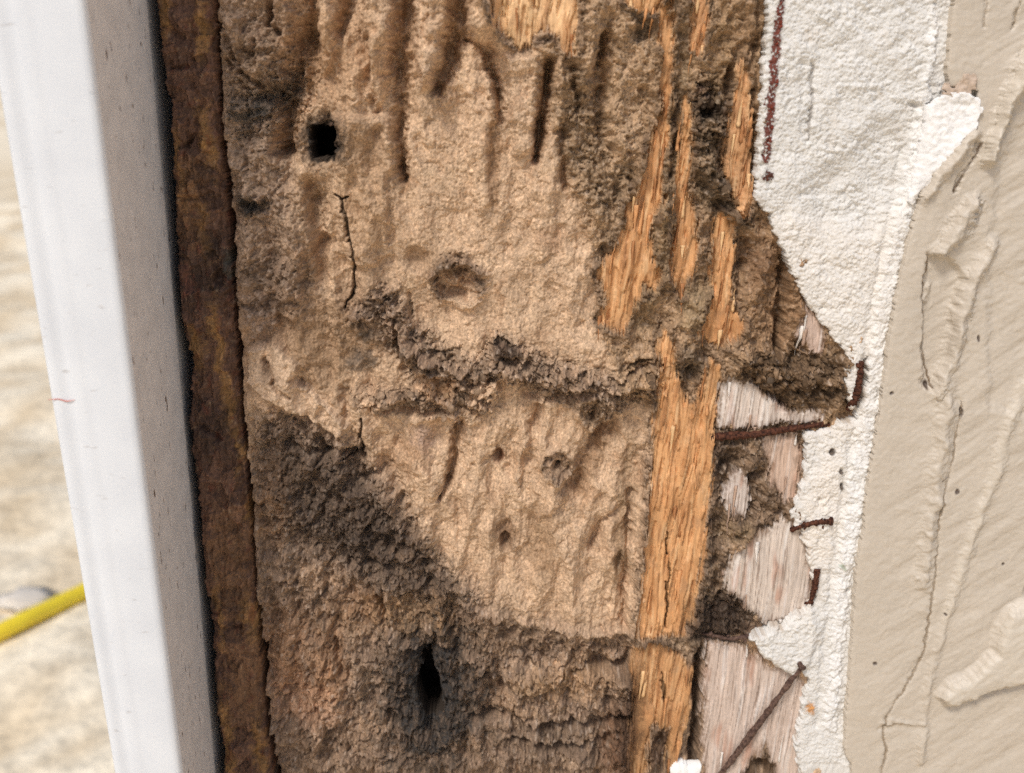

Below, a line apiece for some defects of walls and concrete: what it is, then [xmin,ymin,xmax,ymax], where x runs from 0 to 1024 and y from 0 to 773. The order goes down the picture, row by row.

rust [761,0,785,181]
peeling [907,73,984,205]
damp [238,196,267,217]
crack [337,194,357,308]
peeling [756,356,839,391]
damp [379,603,489,773]
damp [615,680,642,772]